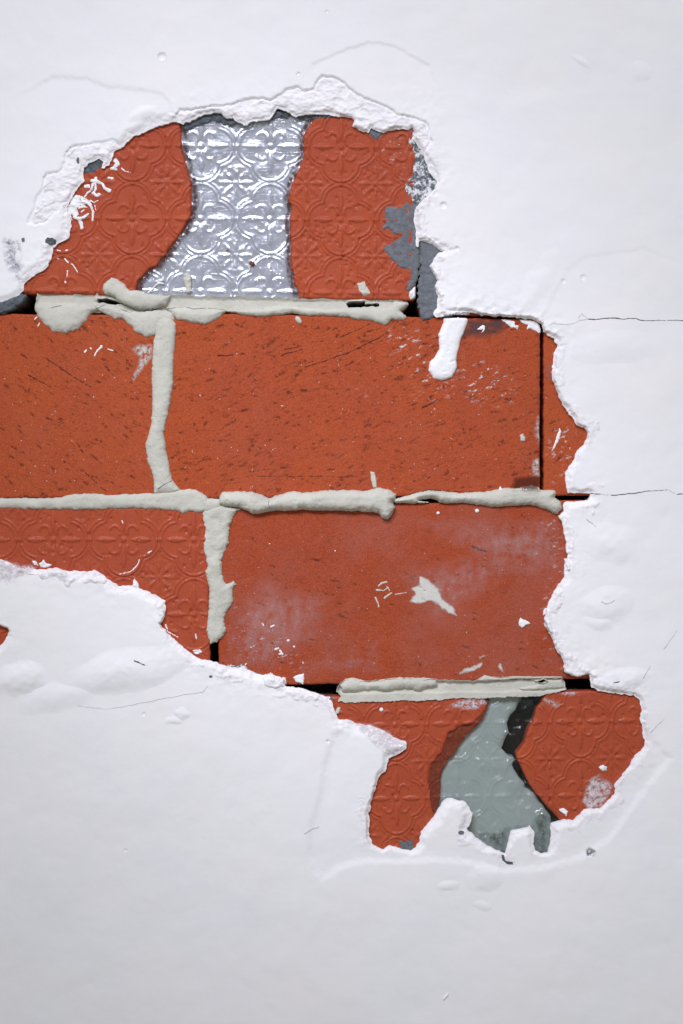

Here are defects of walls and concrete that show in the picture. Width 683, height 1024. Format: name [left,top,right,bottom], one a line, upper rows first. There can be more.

crack [540,314,683,333]
flaking render [0,77,655,867]
crack [579,490,681,527]